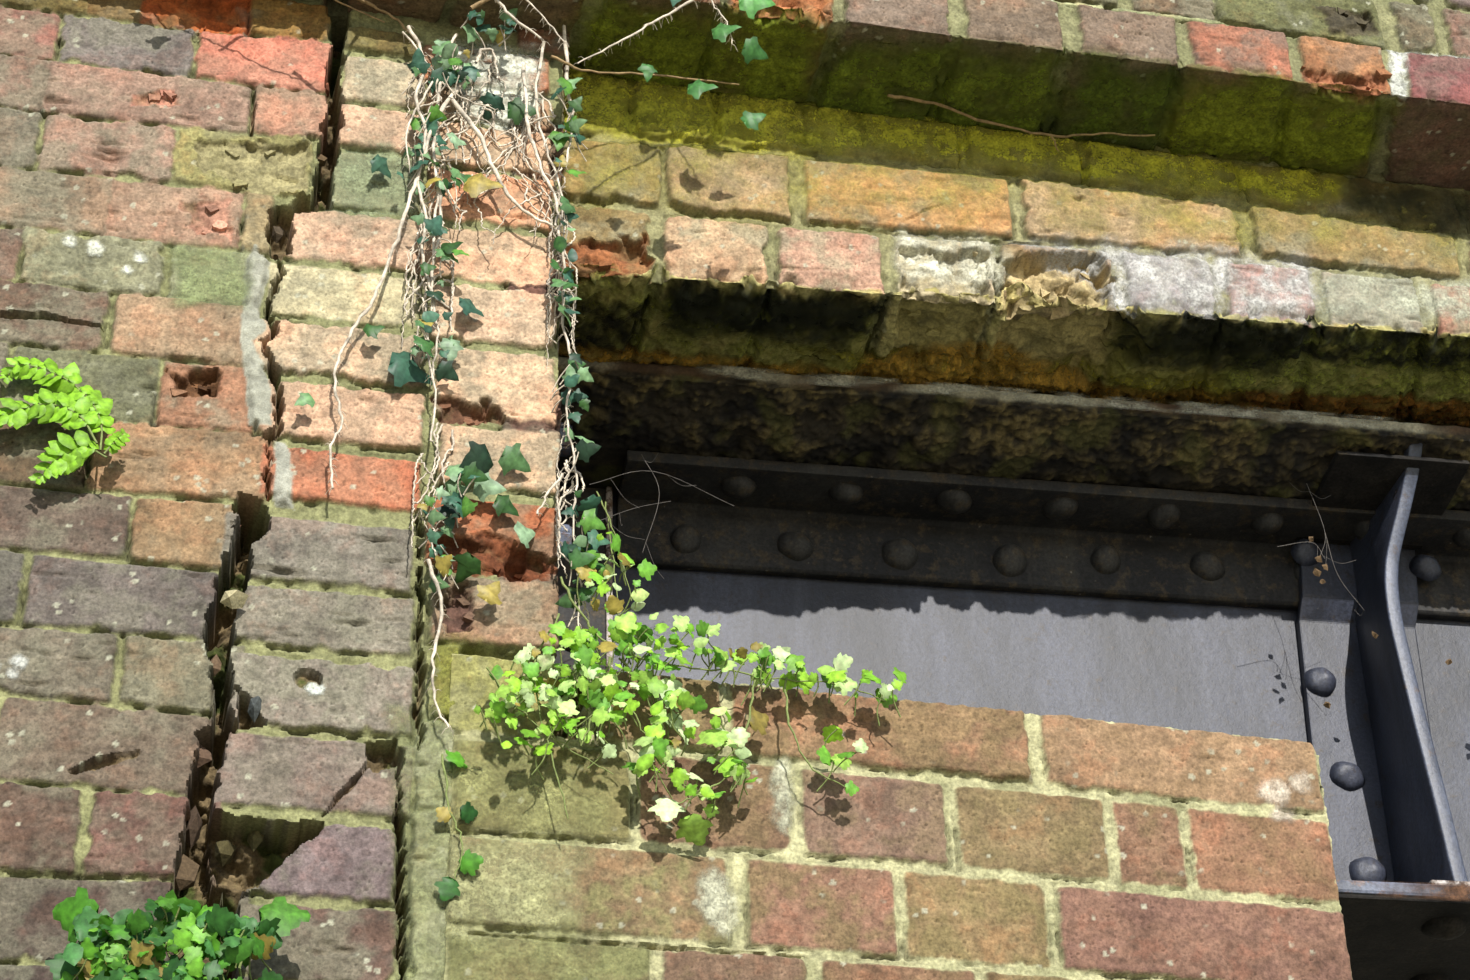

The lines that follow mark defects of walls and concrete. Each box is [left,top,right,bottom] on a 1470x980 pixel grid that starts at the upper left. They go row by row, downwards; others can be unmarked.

spalling [727,0,833,30]
water stain [563,0,1469,202]
water stain [898,231,1004,291]
water stain [665,279,884,350]
spalling [884,244,1147,389]
water stain [1048,249,1470,374]
water stain [815,375,860,386]
water stain [918,384,984,394]
water stain [1181,403,1257,417]
water stain [1280,410,1323,422]
crack [168,0,406,980]
spalling [427,528,560,636]